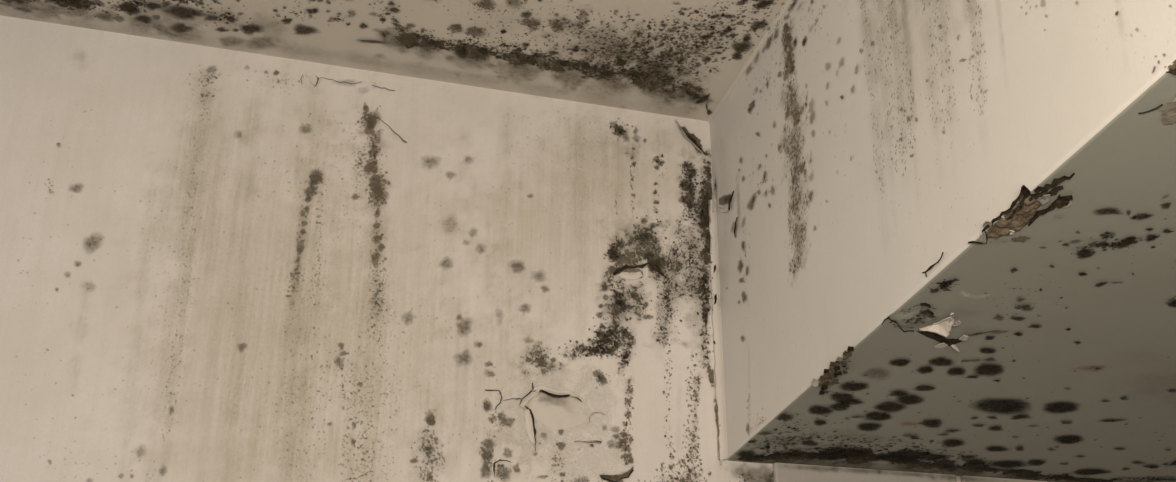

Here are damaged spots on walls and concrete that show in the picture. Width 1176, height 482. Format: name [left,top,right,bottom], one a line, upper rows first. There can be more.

water stain [4,0,260,34]
water stain [273,0,815,273]
peeling [1139,96,1176,125]
water stain [286,171,323,297]
water stain [353,105,407,337]
spalling [968,173,1075,244]
water stain [1059,203,1174,275]
water stain [521,121,720,482]
peeling [916,312,968,352]
spalling [811,346,854,395]
water stain [738,331,1176,482]
peeling [600,465,634,482]